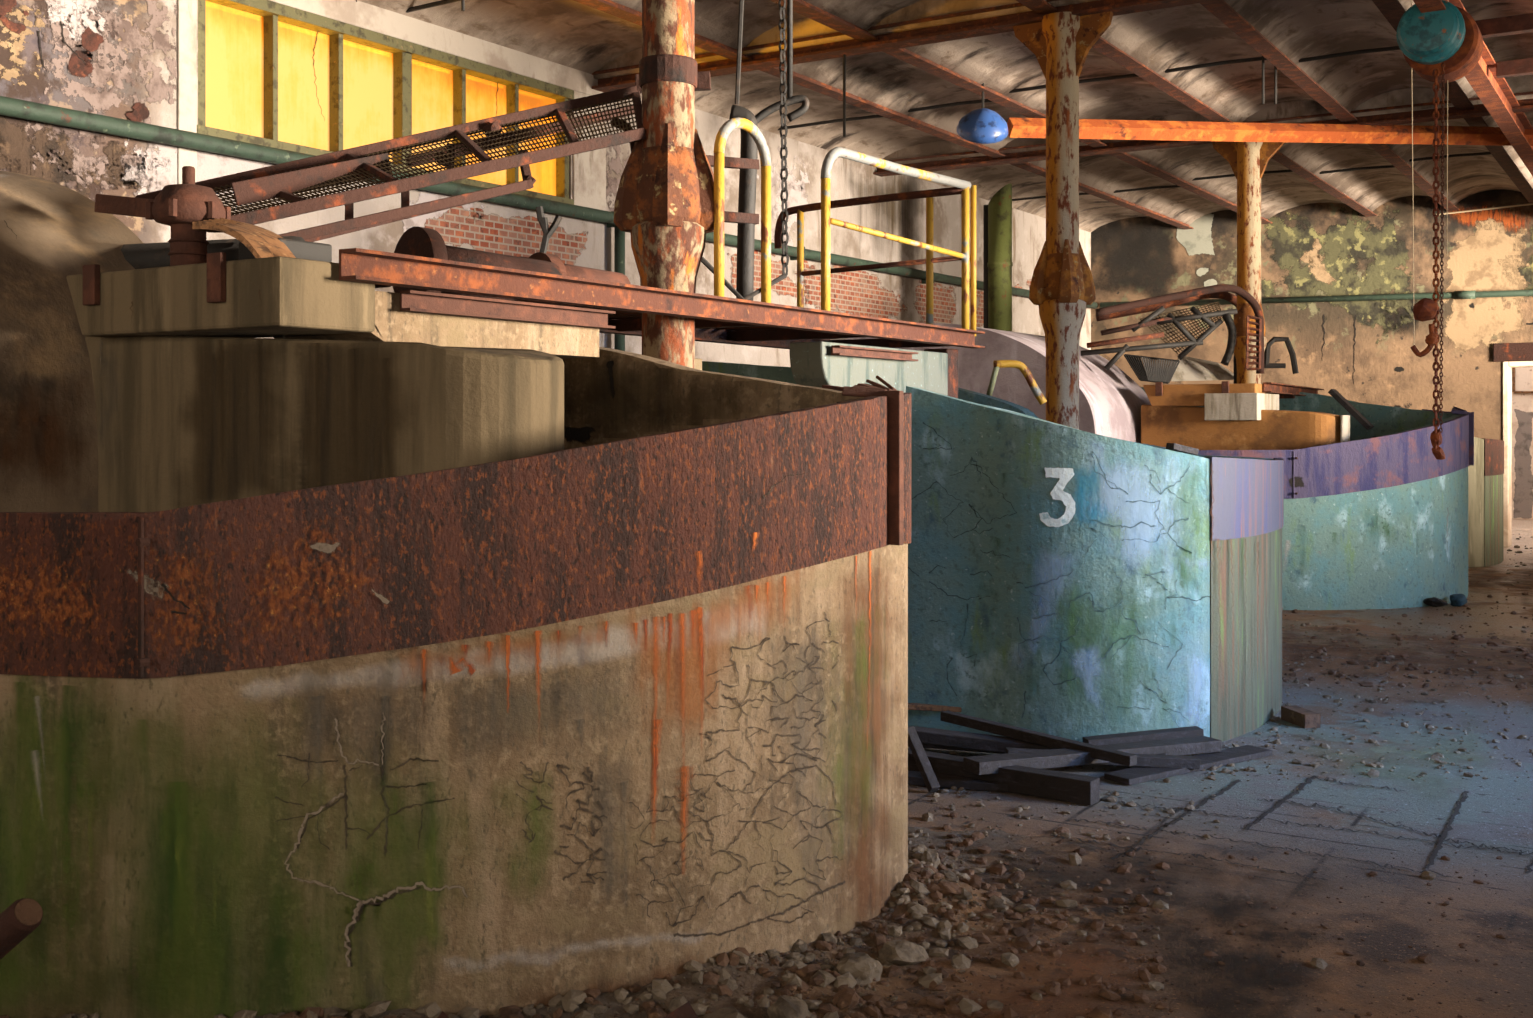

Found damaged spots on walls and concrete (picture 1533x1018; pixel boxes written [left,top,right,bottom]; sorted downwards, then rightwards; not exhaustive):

peeling [0,0,178,198]
peeling [197,150,277,200]
corrosion [0,539,105,650]
corrosion [145,520,388,659]
corrosion [486,635,510,711]
corrosion [535,630,560,704]
corrosion [634,576,786,814]
corrosion [855,551,871,675]
crack [908,422,1209,727]
crack [275,712,468,967]
crack [516,612,845,937]
crack [1051,775,1533,880]